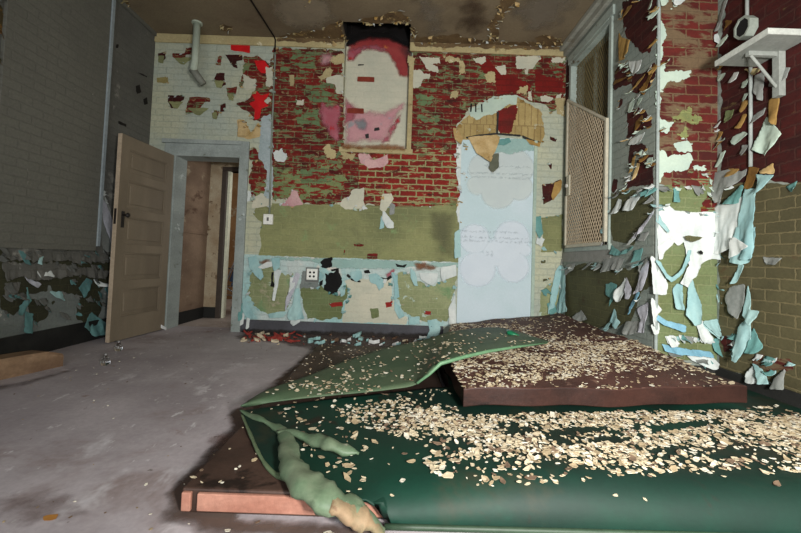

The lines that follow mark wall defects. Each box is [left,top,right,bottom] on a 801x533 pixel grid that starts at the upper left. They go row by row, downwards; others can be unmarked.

flaking render [158,47,192,65]